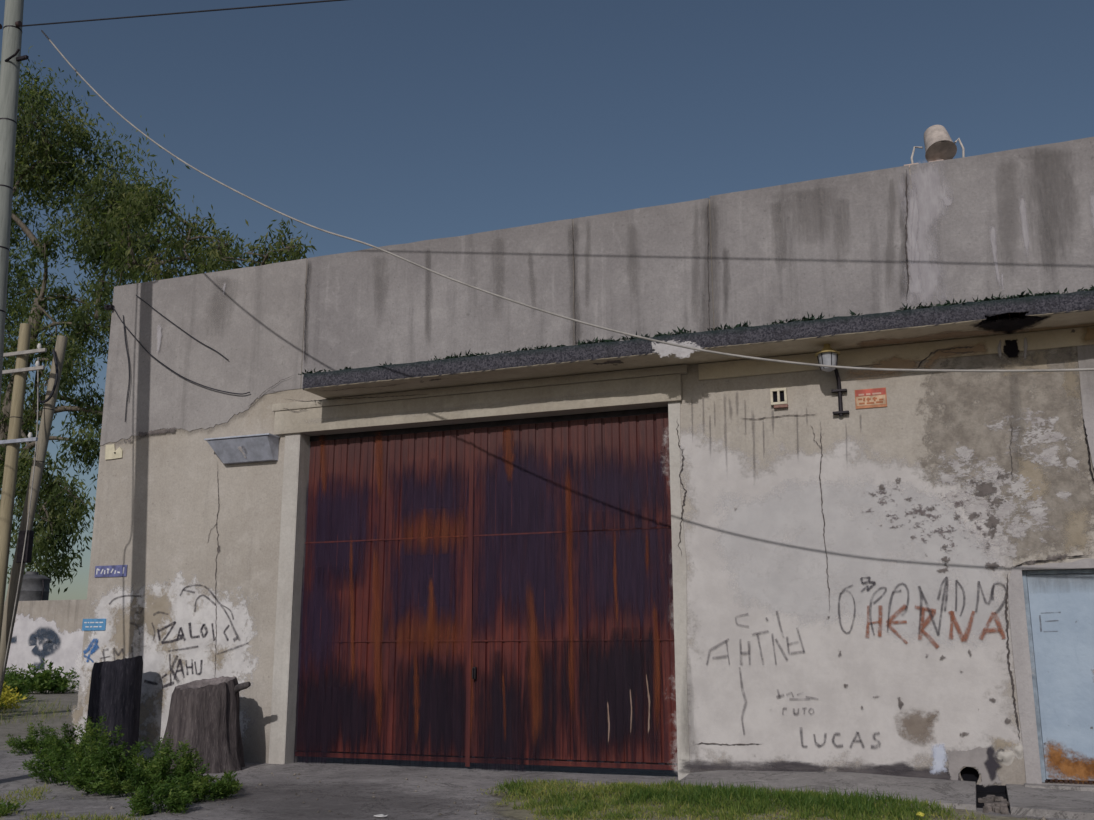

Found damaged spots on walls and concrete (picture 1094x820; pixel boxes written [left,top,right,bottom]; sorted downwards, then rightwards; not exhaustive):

water stain [901,165,952,305]
water stain [1020,199,1030,250]
spalling [652,340,703,359]
water stain [860,323,1094,347]
spalling [988,312,1027,321]
crack [676,418,687,555]
crack [743,414,830,618]
peeling [675,338,1094,772]
crack [1083,419,1094,480]
peeling [5,571,259,758]
crack [1005,554,1088,739]
rust [1044,743,1094,784]